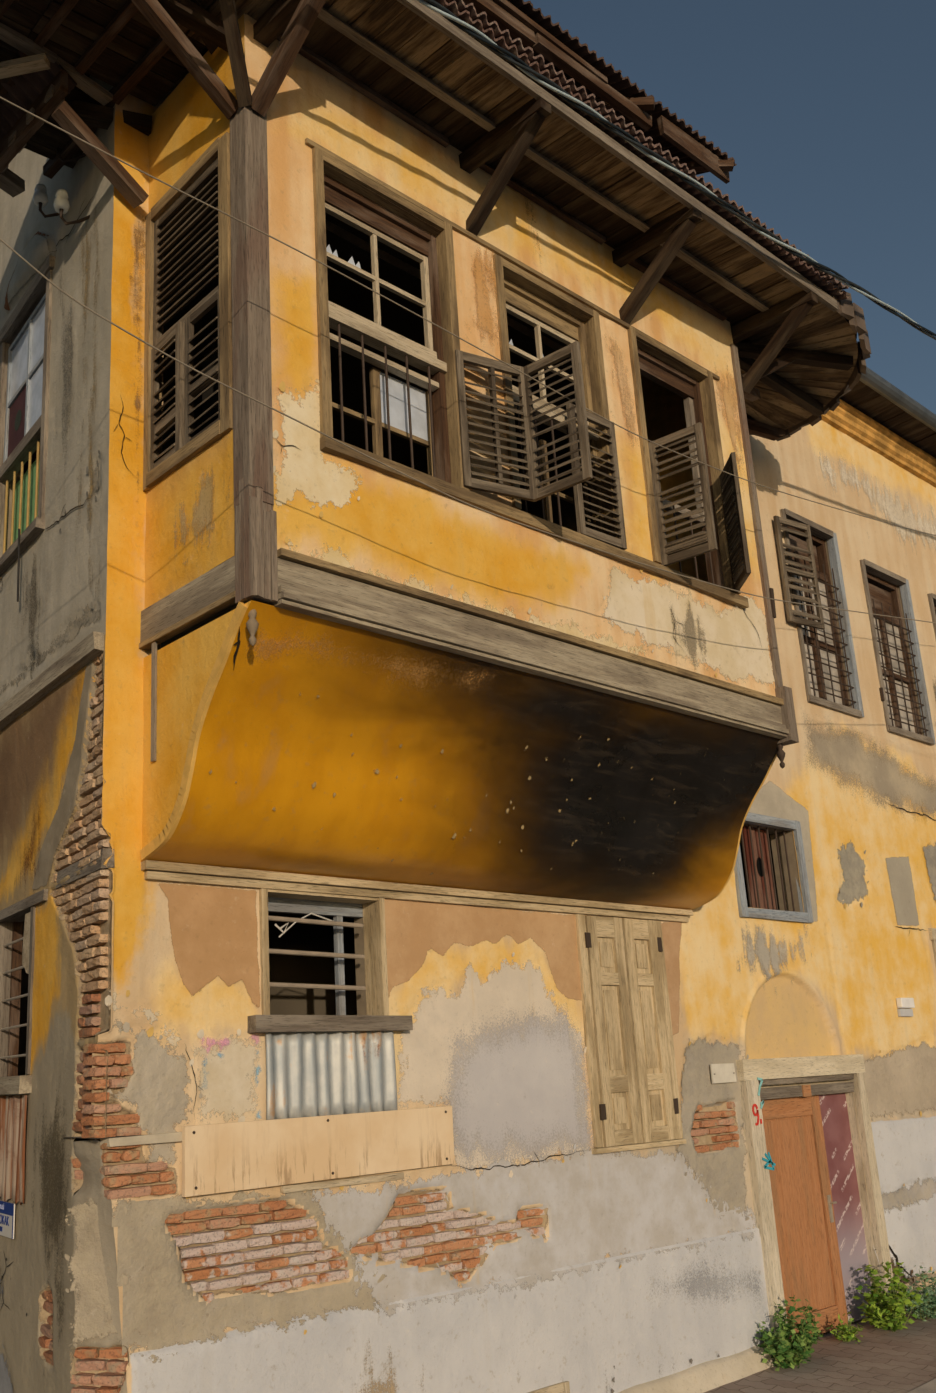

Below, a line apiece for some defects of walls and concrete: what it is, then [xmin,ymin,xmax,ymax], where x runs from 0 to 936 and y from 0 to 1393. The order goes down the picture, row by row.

crack [46,494,95,529]
leakage [60,219,99,527]
crack [115,395,138,479]
peeling [273,379,363,518]
leakage [26,558,41,665]
peeling [284,537,775,689]
leakage [671,603,706,665]
peeling [26,653,757,1393]